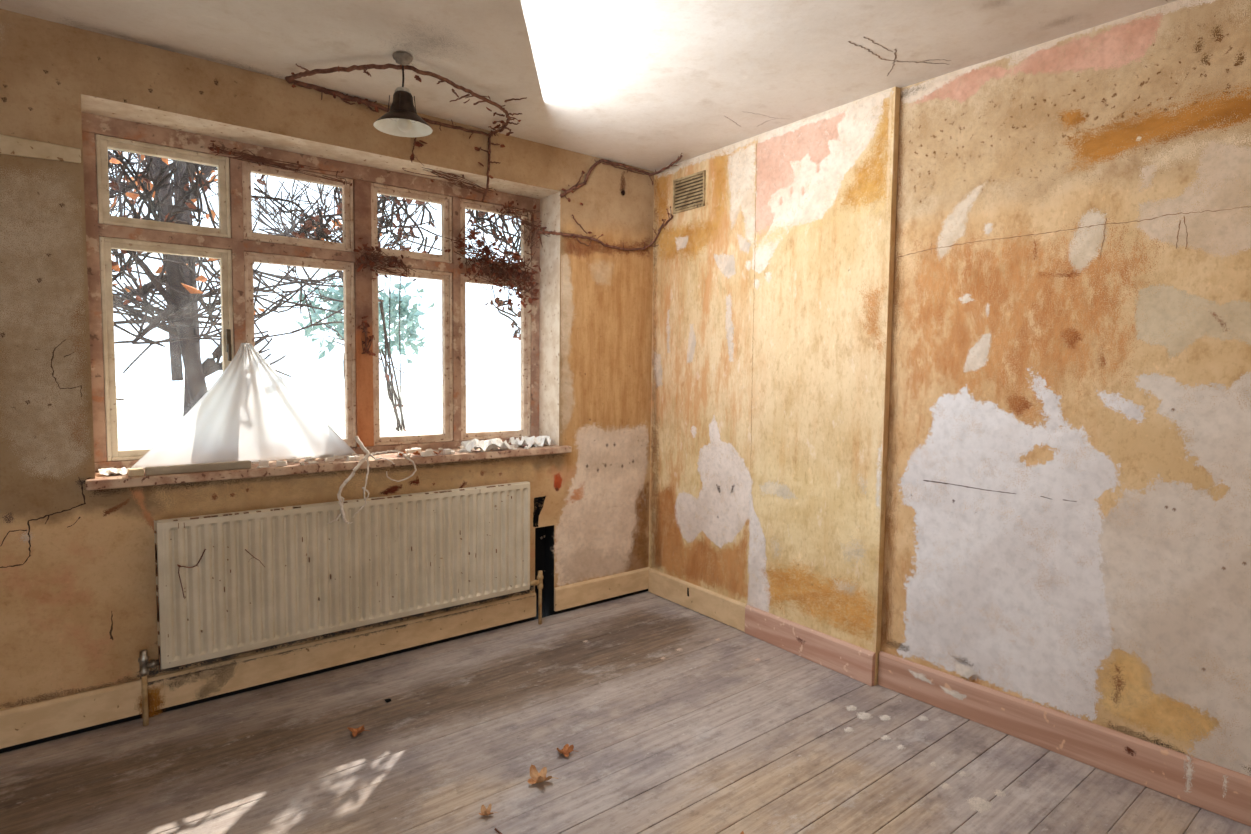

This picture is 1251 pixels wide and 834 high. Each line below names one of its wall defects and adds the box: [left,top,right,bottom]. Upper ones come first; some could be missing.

crack [848,37,951,76]
peeling [727,91,887,291]
peeling [935,180,986,259]
peeling [1067,207,1109,273]
peeling [959,293,991,317]
crack [51,339,82,397]
flaking render [533,253,650,587]
flaking render [1096,389,1147,424]
crack [0,477,90,568]
flaking render [674,414,798,612]
flaking render [896,332,1121,721]